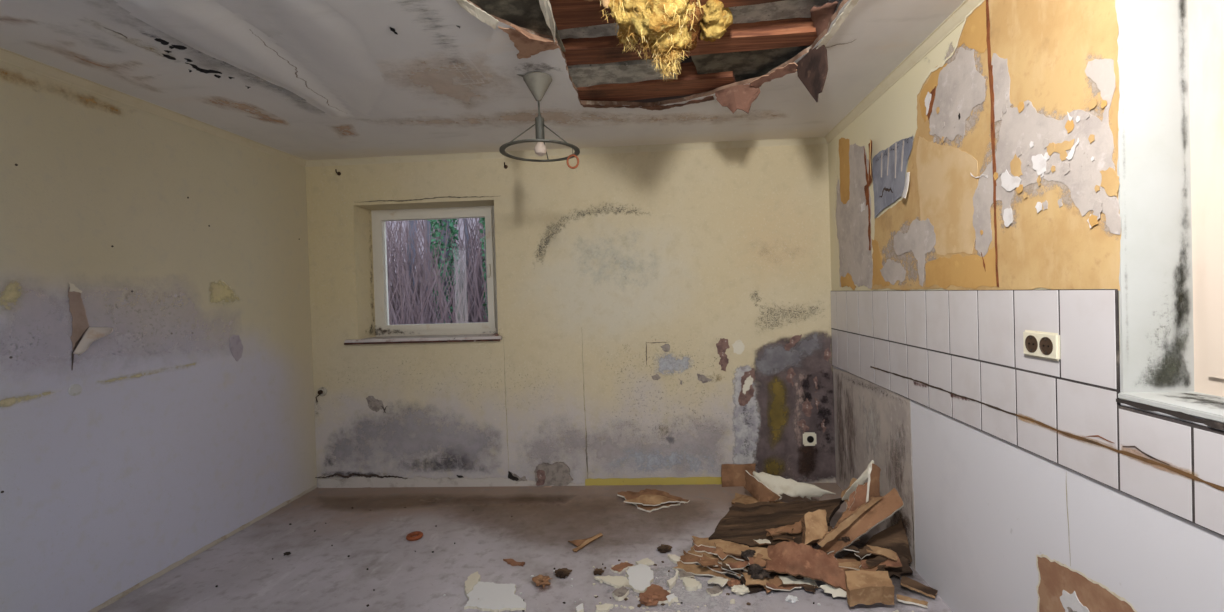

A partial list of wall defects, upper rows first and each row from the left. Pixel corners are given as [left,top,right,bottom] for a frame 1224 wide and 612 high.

crack [250,30,337,109]
spalling [456,0,559,59]
spalling [581,0,859,114]
peeling [834,0,1121,291]
damp [1150,248,1224,408]
damp [315,408,492,479]
spalling [646,338,760,464]
damp [751,291,916,594]
crack [1116,399,1224,430]